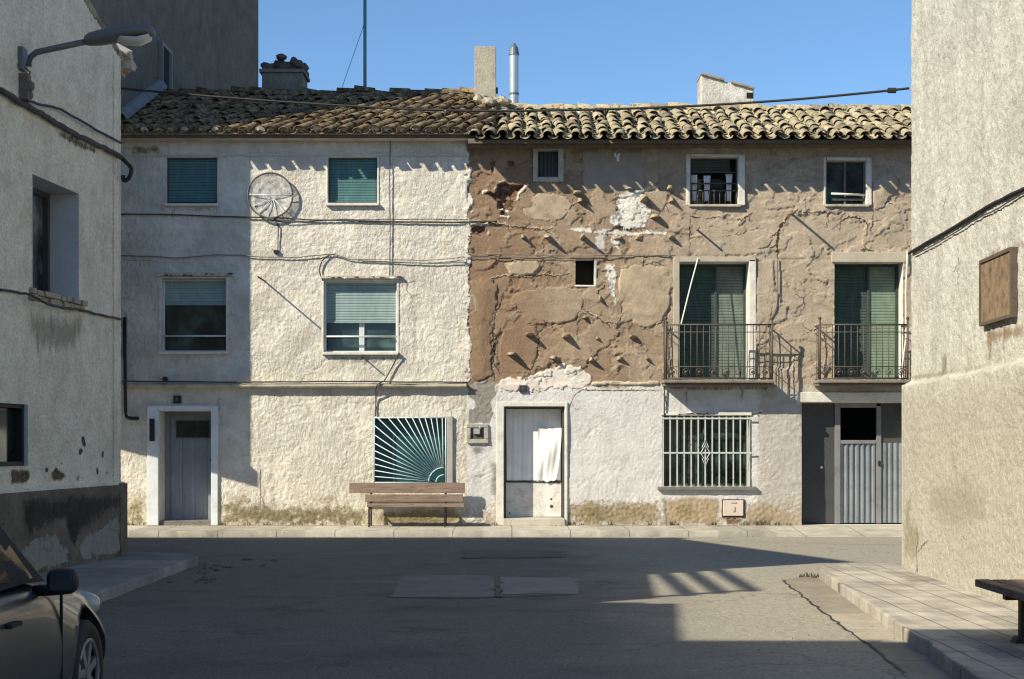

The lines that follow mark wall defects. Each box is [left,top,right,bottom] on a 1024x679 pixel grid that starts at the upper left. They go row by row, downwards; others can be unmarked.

crack [663,191,753,248]
crack [764,178,902,258]
flaking render [462,149,529,382]
crack [469,200,576,406]
crack [580,285,664,329]
crack [796,294,831,337]
flaking render [495,363,660,393]
damp [25,496,142,544]